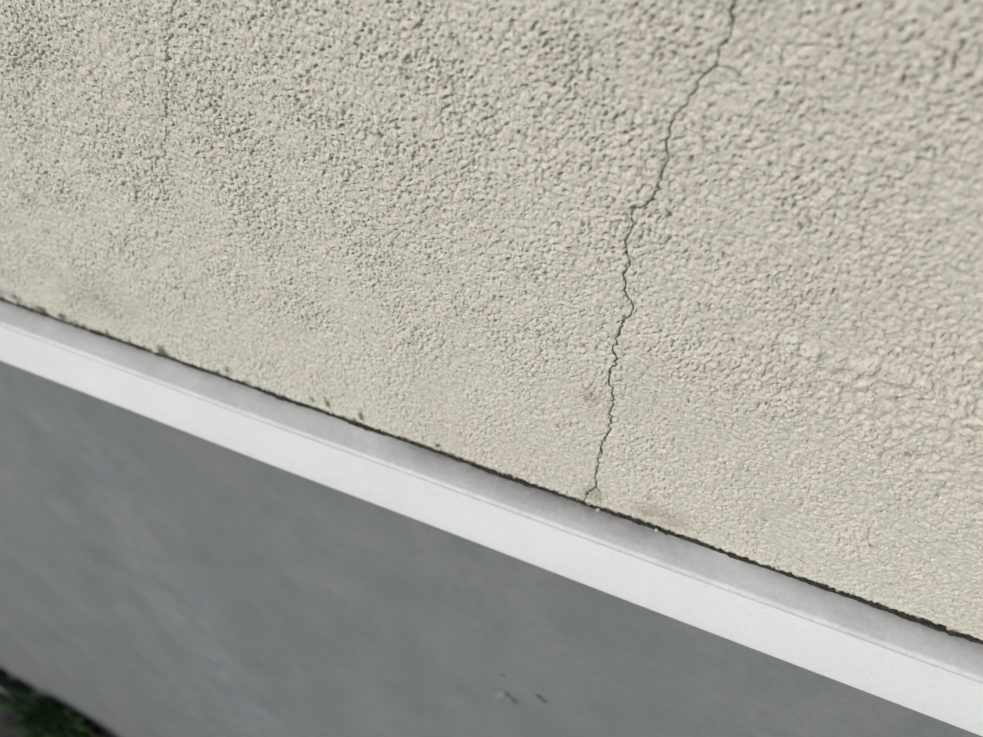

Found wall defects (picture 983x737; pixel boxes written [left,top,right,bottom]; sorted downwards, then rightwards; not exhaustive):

crack [583,0,743,502]